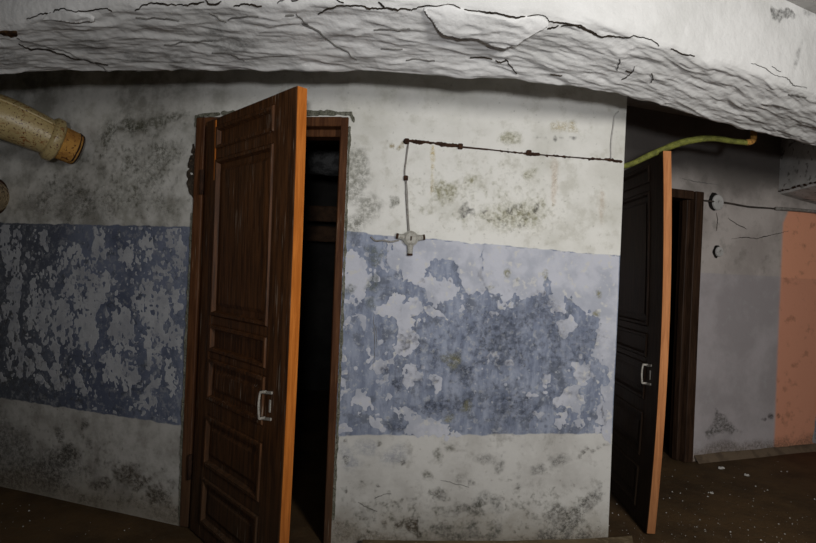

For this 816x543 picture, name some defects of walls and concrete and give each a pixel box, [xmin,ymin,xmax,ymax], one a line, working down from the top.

crack [27,8,112,19]
crack [135,0,695,62]
crack [17,38,140,72]
crack [470,57,517,74]
crack [751,63,807,98]
peeling [0,225,187,423]
peeling [307,109,619,521]